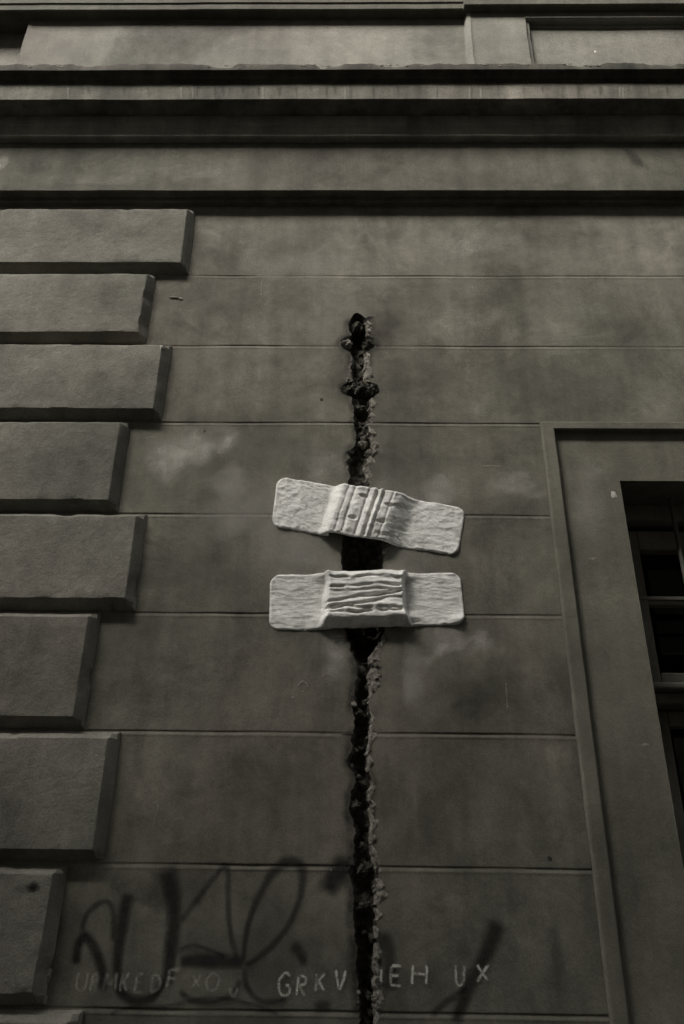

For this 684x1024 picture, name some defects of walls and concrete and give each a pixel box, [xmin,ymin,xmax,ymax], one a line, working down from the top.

crack [341,313,380,487]
crack [341,535,386,571]
crack [342,627,388,1024]